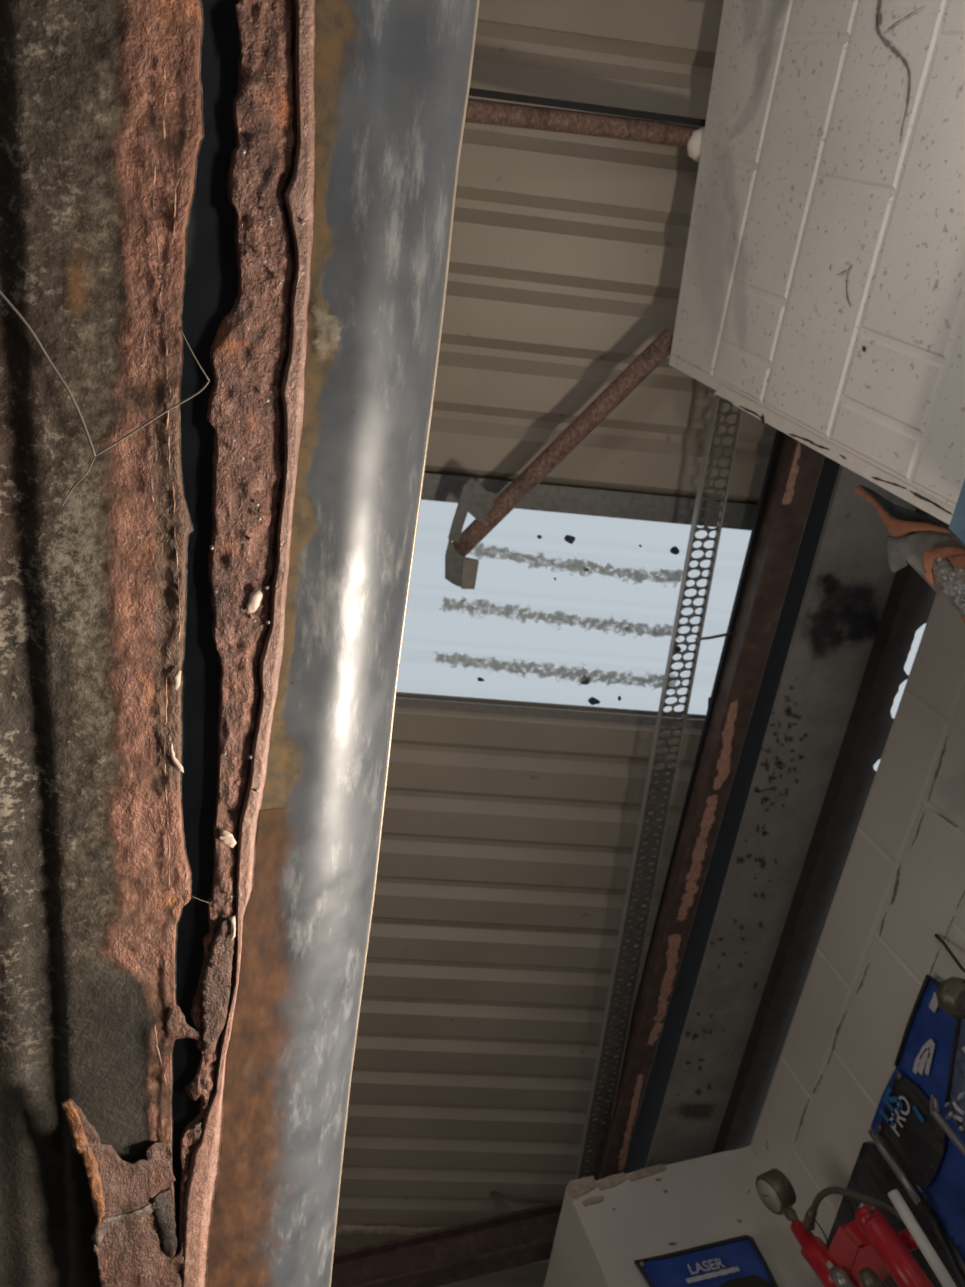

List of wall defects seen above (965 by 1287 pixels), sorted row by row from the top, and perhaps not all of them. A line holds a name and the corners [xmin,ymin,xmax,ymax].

rust [103,0,356,1287]
peeling [647,698,739,1046]
mould [737,683,807,897]
mould [809,576,880,656]
crack [795,738,956,1141]